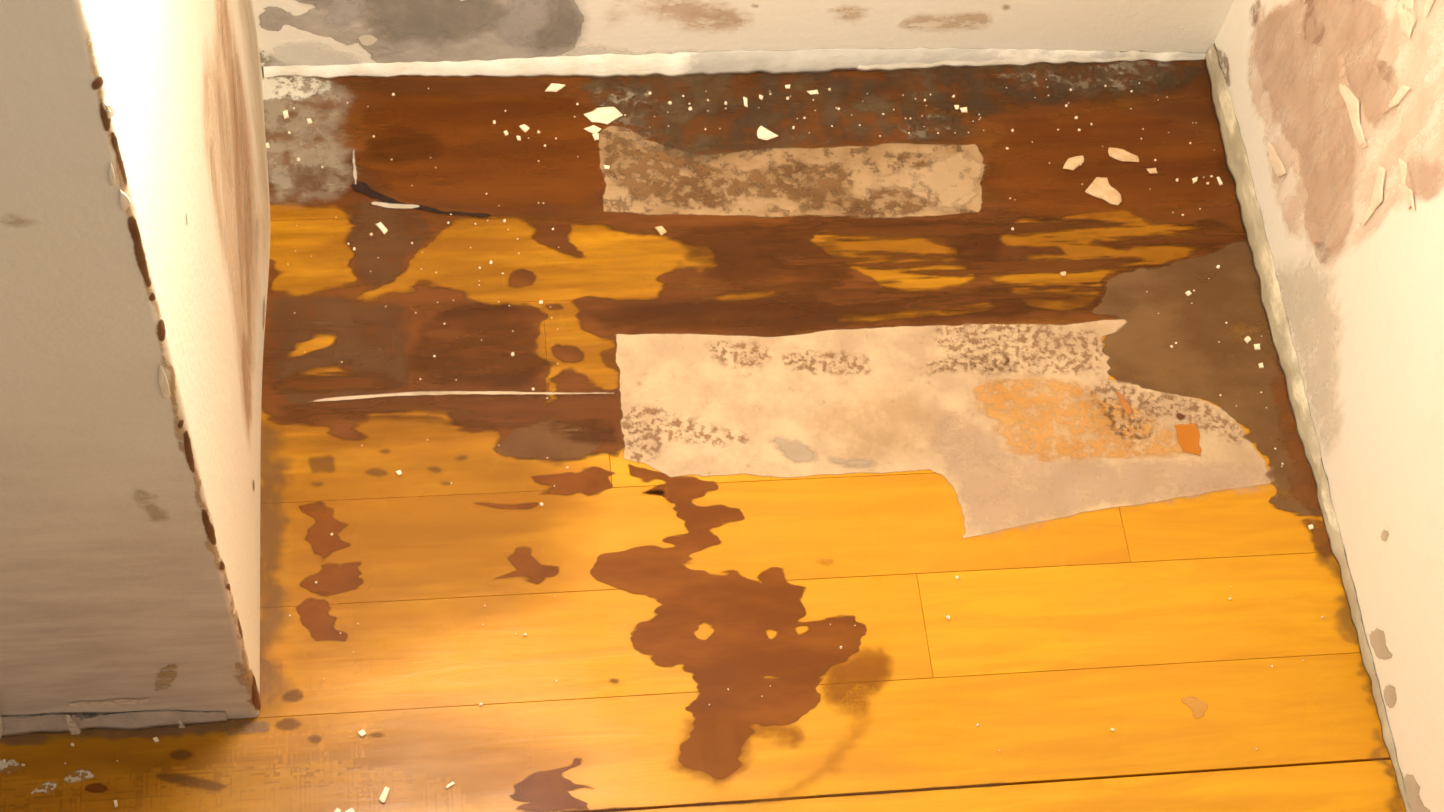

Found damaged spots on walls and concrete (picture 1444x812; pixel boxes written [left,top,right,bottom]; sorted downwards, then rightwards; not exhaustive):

water stain [663,3,741,27]
water stain [907,15,985,27]
peeling [584,107,985,236]
water stain [1250,0,1444,262]
water stain [230,49,1322,780]
peeling [616,319,1271,538]
spalling [236,664,261,710]